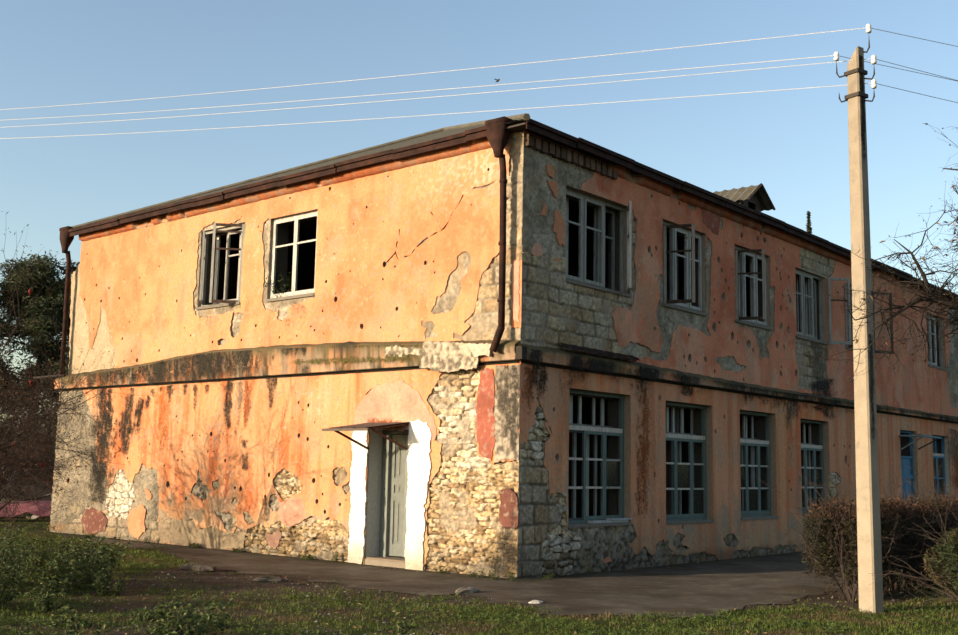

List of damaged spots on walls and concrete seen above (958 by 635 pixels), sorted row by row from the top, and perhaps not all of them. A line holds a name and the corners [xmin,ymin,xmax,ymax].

flaking render [799,248,836,278]
flaking render [68,265,117,375]
damp [295,354,409,372]
flaking render [384,131,716,579]
flaking render [795,336,827,391]
damp [89,384,209,503]
flaking render [49,463,350,562]
flaking render [723,533,795,559]